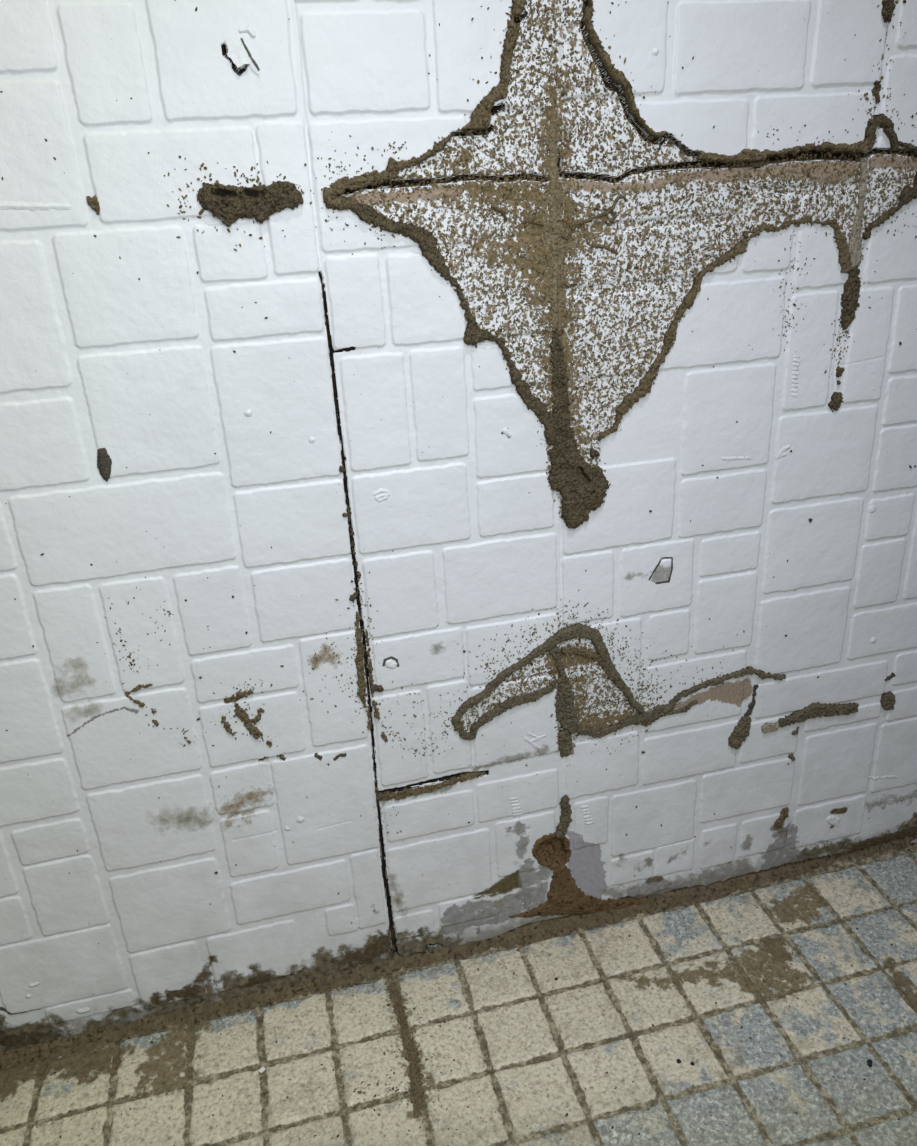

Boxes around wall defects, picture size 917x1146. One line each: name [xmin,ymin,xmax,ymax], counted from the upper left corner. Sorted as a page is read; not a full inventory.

peeling [221,25,260,76]
crack [342,147,915,197]
peeling [649,557,673,584]
crack [318,271,547,958]